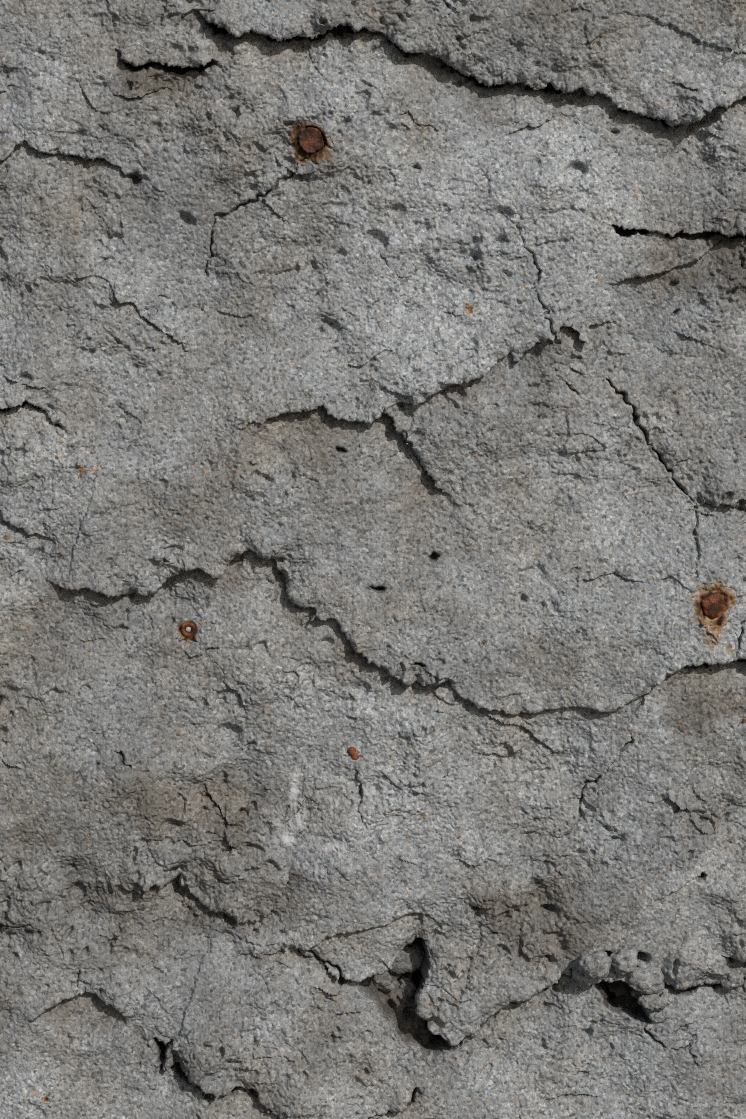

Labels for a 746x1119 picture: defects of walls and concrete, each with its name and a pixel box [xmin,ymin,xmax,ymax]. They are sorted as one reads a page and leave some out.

rust [289,121,335,165]
crack [206,157,327,276]
crack [404,433,432,479]
rust [177,617,202,646]
rust [687,578,739,660]
crack [736,622,745,659]
spalling [55,854,651,1055]
flaking render [663,944,746,998]